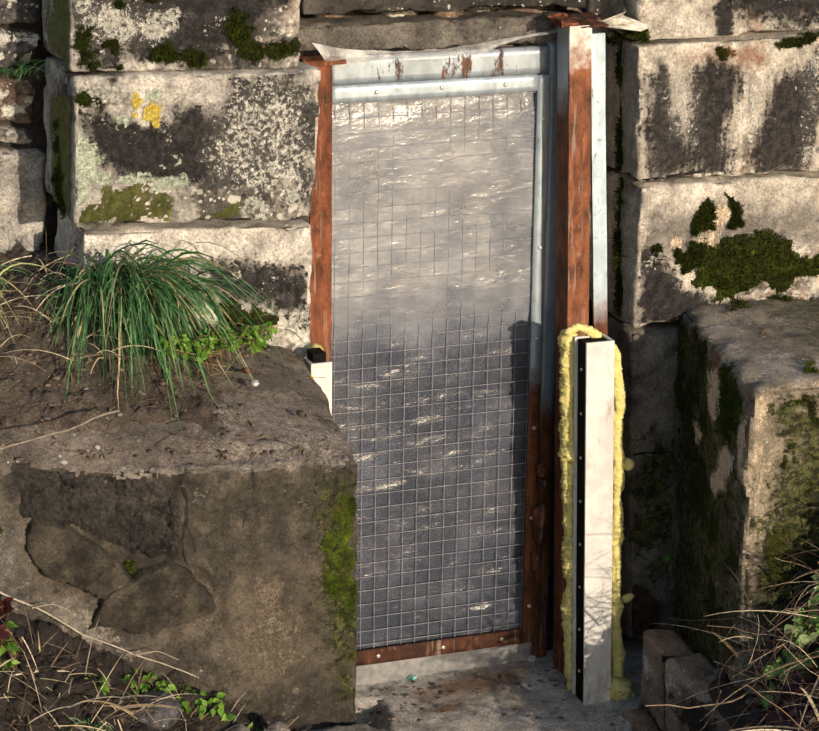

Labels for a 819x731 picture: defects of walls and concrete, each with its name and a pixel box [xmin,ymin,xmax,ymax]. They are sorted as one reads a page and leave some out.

spalling [12,377,349,558]
peeling [221,561,314,698]